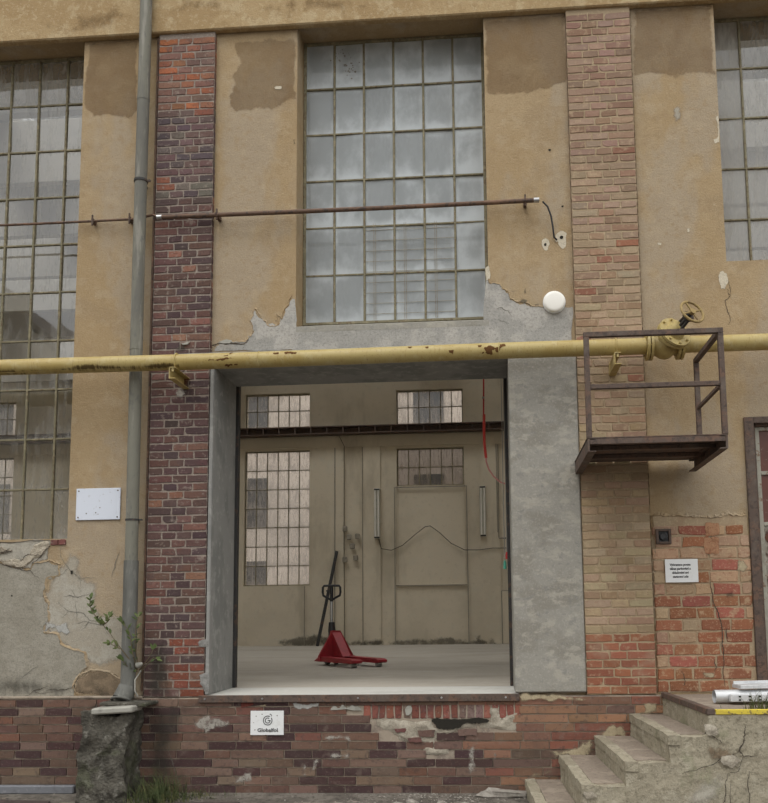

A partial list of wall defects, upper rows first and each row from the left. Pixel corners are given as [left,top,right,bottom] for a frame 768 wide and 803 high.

peeling [478,265,573,355]
peeling [0,539,89,696]
crack [710,583,728,683]
spalling [331,701,521,755]
crack [682,726,753,803]